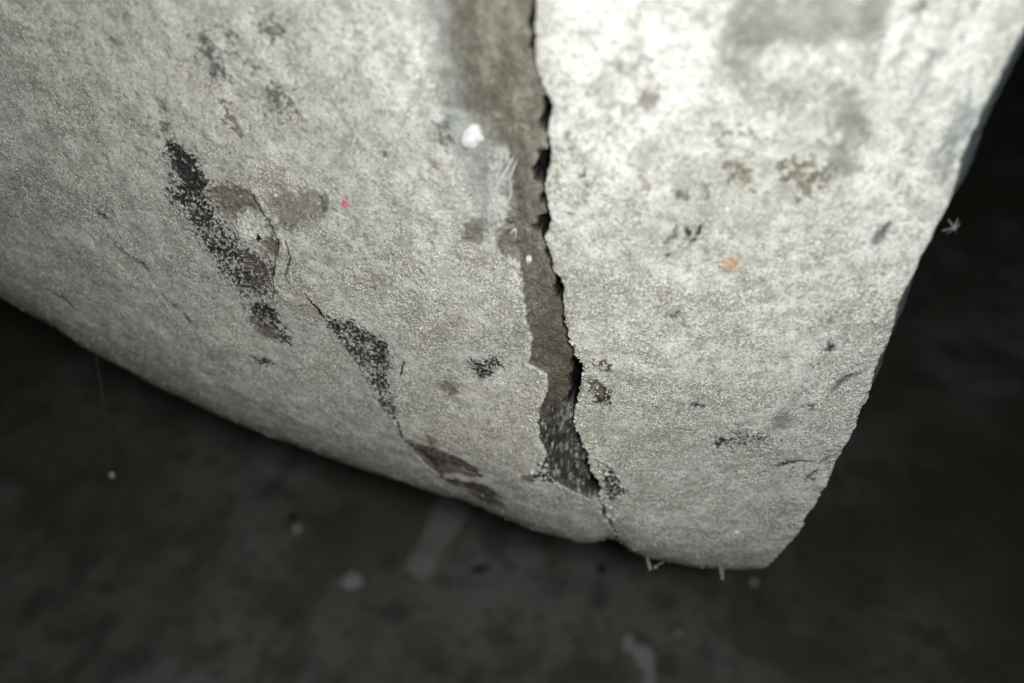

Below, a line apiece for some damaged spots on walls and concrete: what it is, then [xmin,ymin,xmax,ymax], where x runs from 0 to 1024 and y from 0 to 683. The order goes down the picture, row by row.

crack [257,234,291,294]
spalling [431,0,628,501]
crack [499,0,655,539]